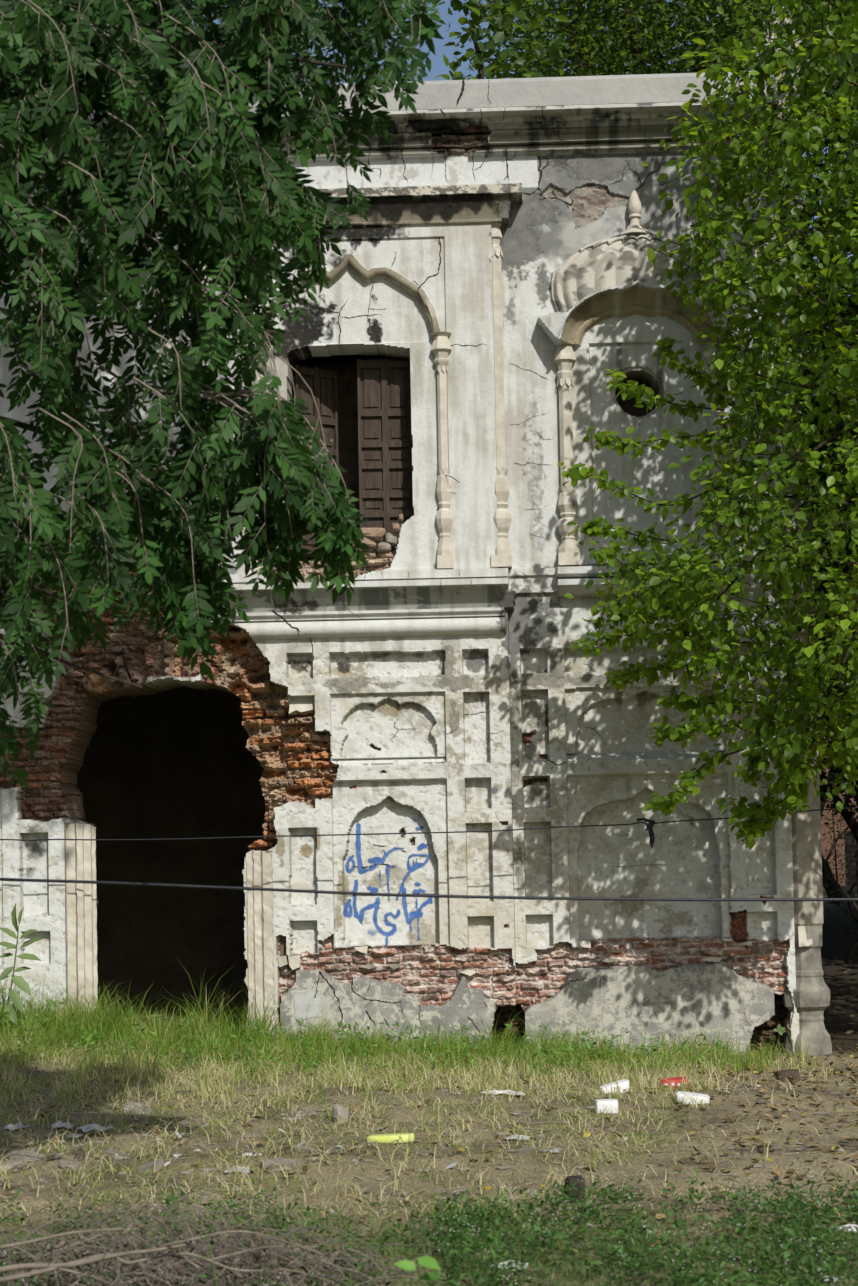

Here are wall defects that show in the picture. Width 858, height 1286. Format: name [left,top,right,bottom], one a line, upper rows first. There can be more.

leakage [367,118,506,160]
leakage [515,116,682,181]
spalling [540,184,629,229]
crack [321,236,489,347]
flaking render [289,700,313,714]
spalling [278,910,813,1051]